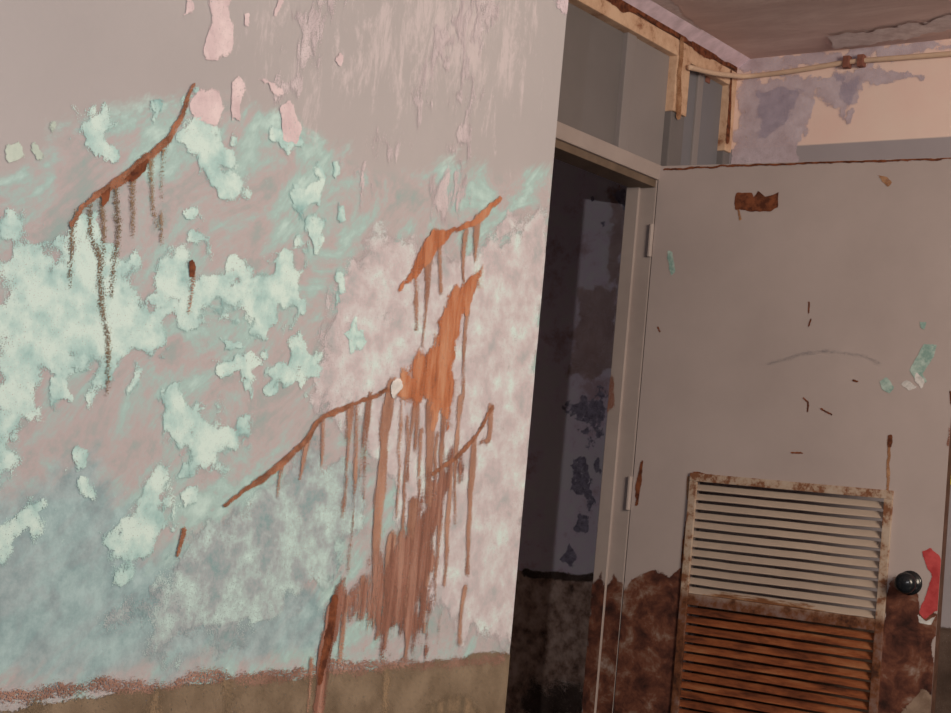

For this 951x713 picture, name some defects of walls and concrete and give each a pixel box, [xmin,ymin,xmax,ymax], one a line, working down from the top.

peeling [70,102,121,163]
corrosion [67,83,195,394]
peeling [175,76,253,212]
peeling [203,0,250,61]
corrosion [607,0,738,144]
corrosion [734,192,779,220]
peeling [731,15,951,164]
peeling [0,161,549,658]
corrosion [222,196,502,713]
peeling [562,383,609,533]
corrosion [582,521,686,713]
corrosion [878,577,937,713]